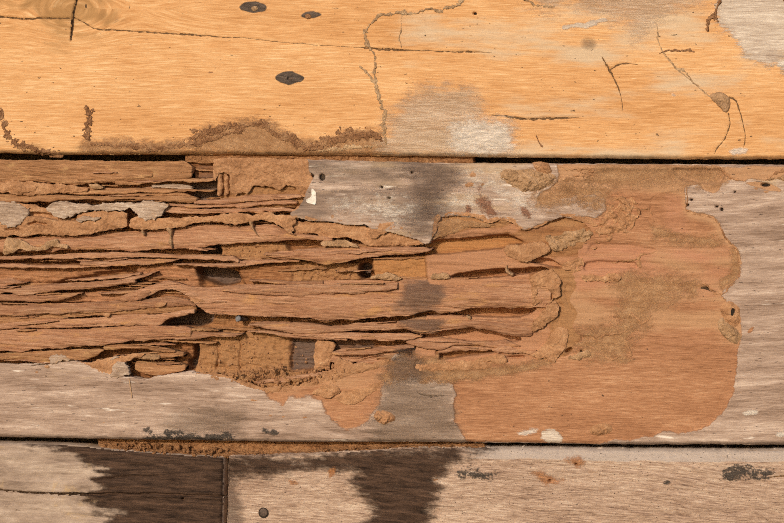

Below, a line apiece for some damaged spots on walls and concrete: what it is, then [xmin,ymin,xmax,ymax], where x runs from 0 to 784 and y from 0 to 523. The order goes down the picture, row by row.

crack [0,0,490,53]
peeling [266,164,784,444]
water stain [32,444,493,523]